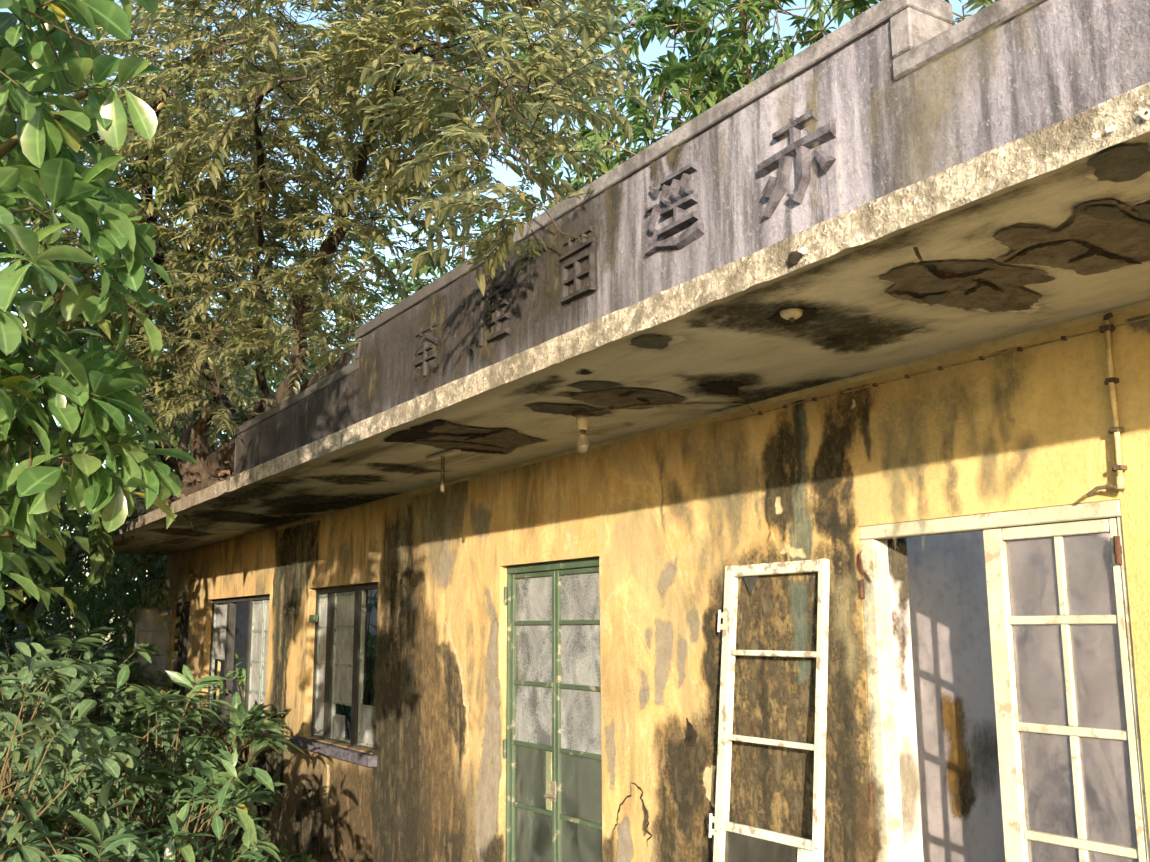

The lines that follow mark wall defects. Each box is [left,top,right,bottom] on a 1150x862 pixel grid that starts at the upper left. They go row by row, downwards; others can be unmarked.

spalling [1137,108,1150,119]
spalling [1086,145,1150,182]
spalling [879,200,1150,312]
water stain [703,300,928,352]
spalling [527,370,687,416]
spalling [384,419,548,454]
water stain [885,392,956,658]
water stain [147,459,446,826]
water stain [296,491,464,862]
water stain [653,374,881,862]
crack [612,782,652,847]
water stain [899,754,919,824]